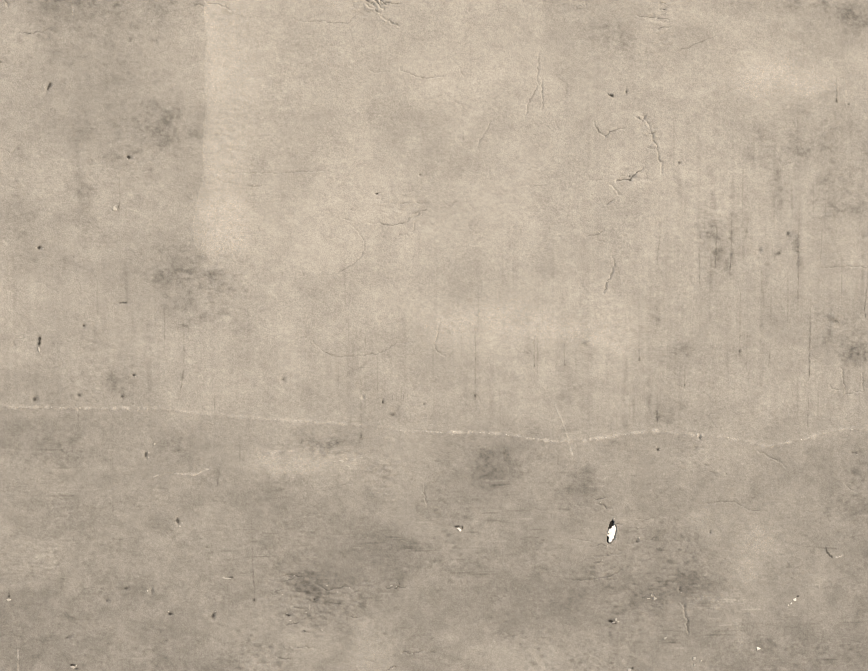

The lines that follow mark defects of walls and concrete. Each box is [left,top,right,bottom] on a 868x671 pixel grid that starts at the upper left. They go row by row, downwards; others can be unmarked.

flaking render [607,518,618,546]